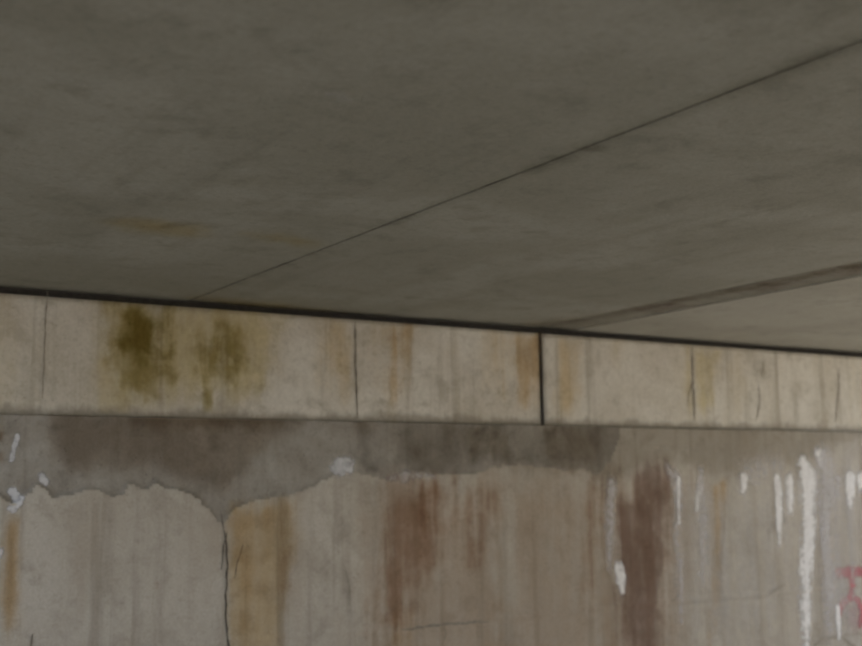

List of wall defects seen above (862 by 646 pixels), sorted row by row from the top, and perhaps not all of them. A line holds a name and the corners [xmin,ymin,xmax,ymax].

water stain [9,433,20,462]
water stain [7,488,24,513]
water stain [739,473,748,495]
water stain [845,470,862,510]
water stain [774,447,825,646]
crack [221,515,243,646]
water stain [615,561,626,595]